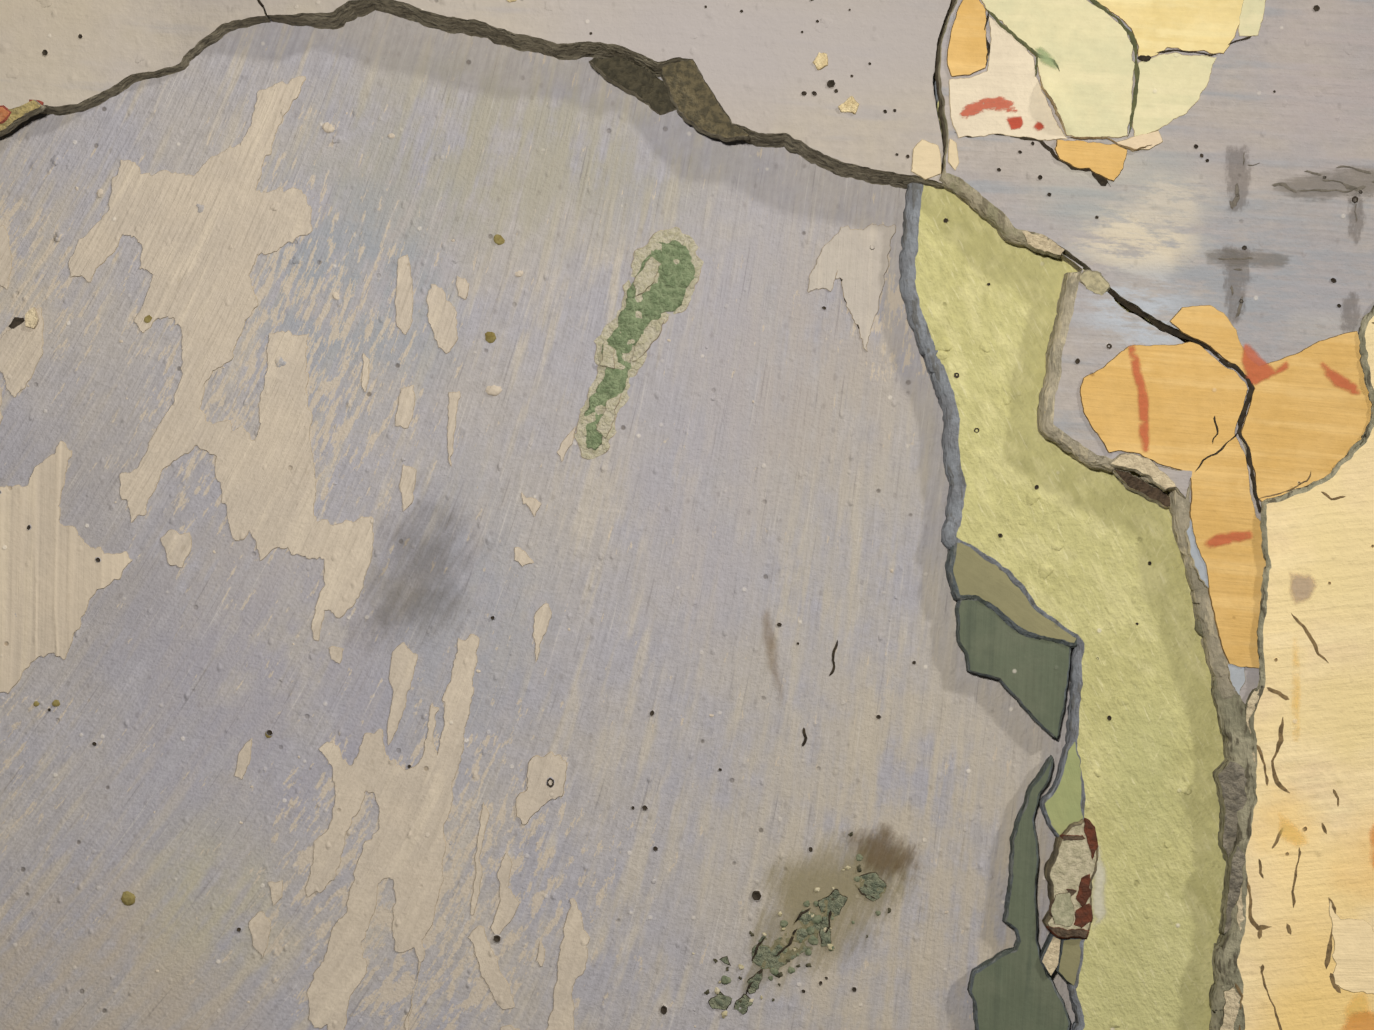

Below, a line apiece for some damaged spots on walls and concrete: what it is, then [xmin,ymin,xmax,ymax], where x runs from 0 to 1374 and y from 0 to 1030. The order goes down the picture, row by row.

peeling [0,0,271,137]
crack [934,0,1251,187]
peeling [0,307,44,424]
peeling [68,76,374,664]
crack [1108,288,1346,512]
peeling [0,441,132,694]
peeling [260,0,1226,1030]
peeling [937,0,1374,1030]
crack [1257,687,1290,793]
crack [1291,613,1328,662]
peeling [248,880,283,958]
crack [1235,789,1341,1030]